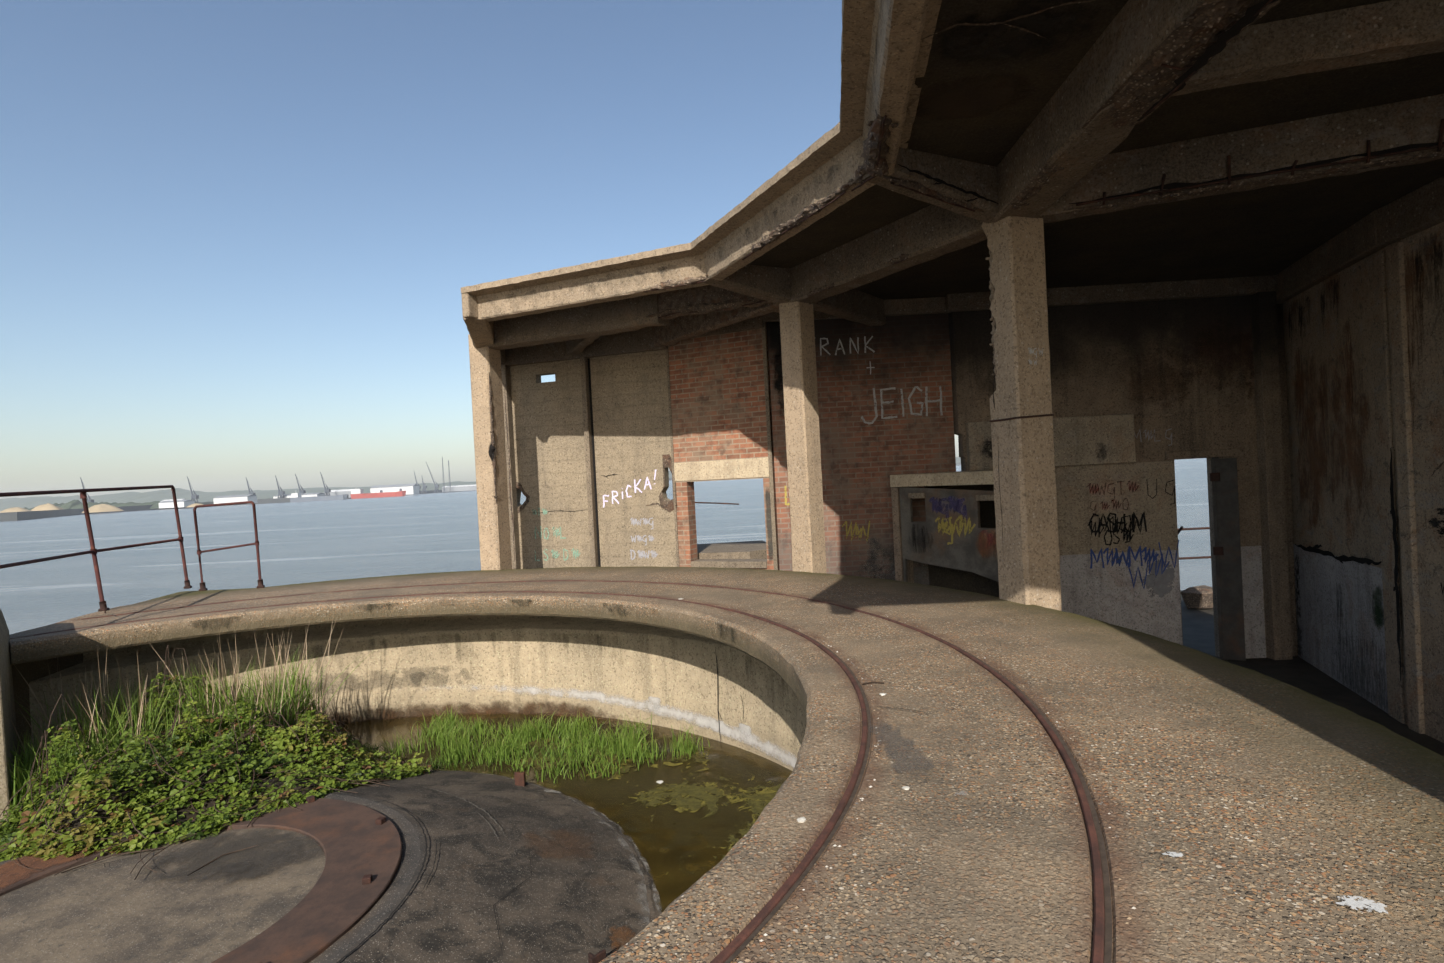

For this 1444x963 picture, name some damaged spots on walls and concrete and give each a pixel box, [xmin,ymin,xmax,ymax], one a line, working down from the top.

spalling [742,110,985,260]
spalling [1063,119,1444,214]
crack [1295,448,1409,681]
crack [715,647,744,744]